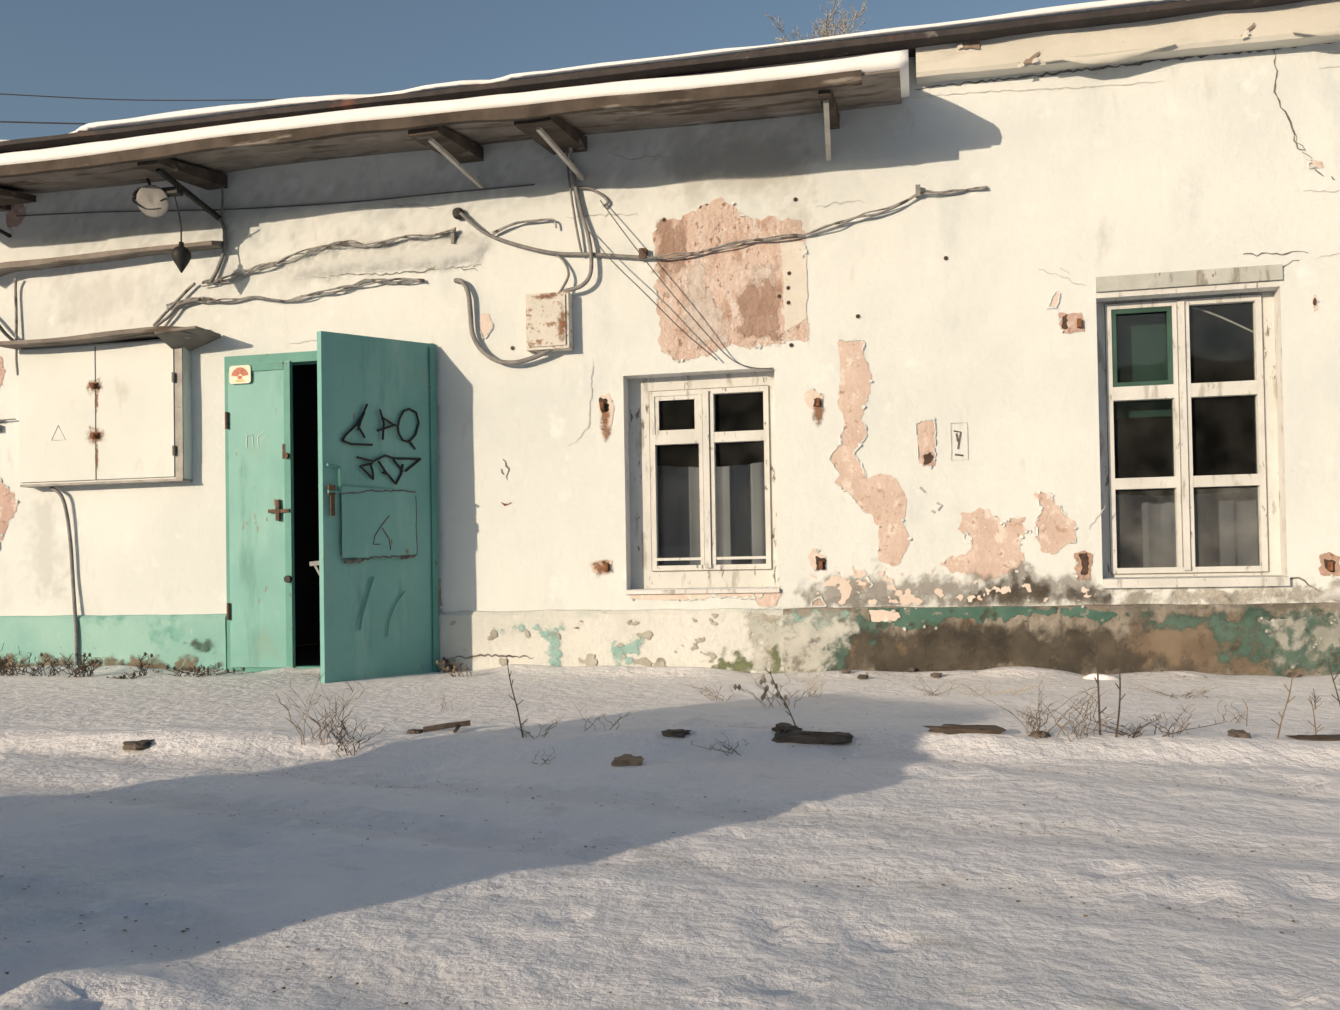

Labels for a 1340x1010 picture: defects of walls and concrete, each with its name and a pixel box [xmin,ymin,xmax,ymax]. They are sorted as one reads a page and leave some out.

peeling [1292,26,1340,36]
crack [912,42,1340,192]
peeling [652,197,809,363]
peeling [0,478,19,541]
peeling [804,339,1130,631]
spalling [578,653,597,666]
peeling [613,578,782,669]
leakage [744,564,1340,674]